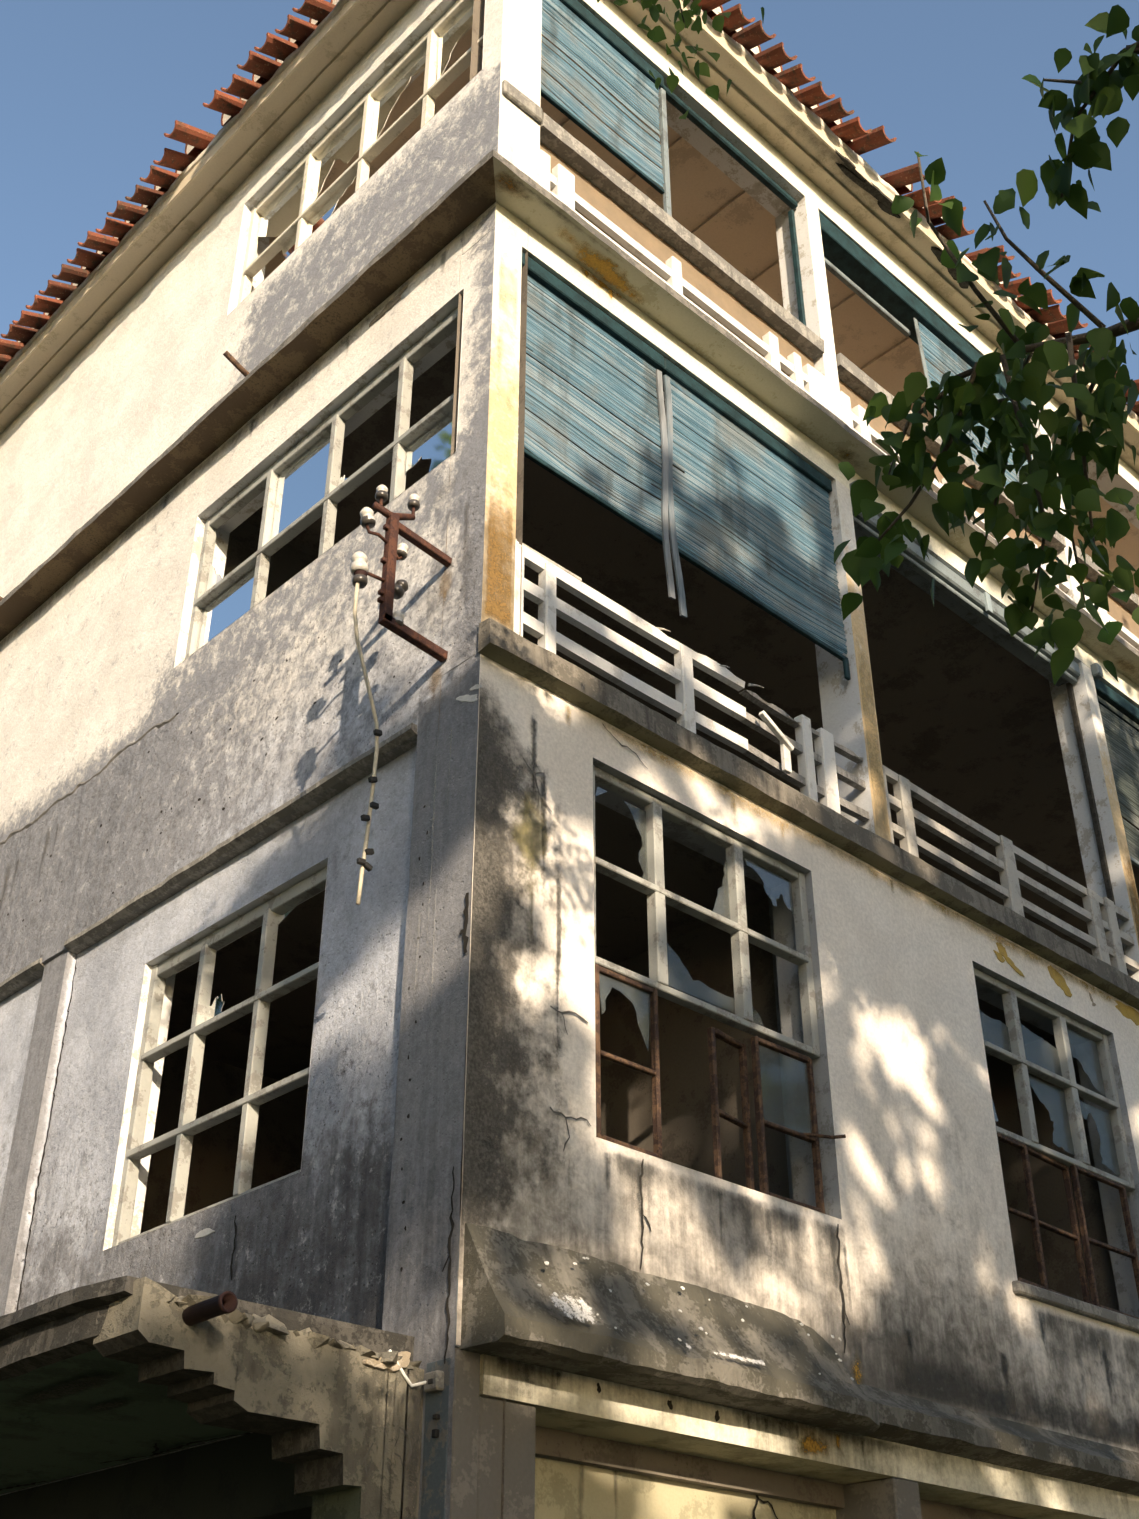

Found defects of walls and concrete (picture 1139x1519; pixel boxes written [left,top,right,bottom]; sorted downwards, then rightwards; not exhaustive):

leakage [461,688,561,1227]
crack [639,1159,651,1269]
peeling [537,1284,599,1324]
peeling [714,1352,765,1366]
leakage [896,1313,1139,1447]